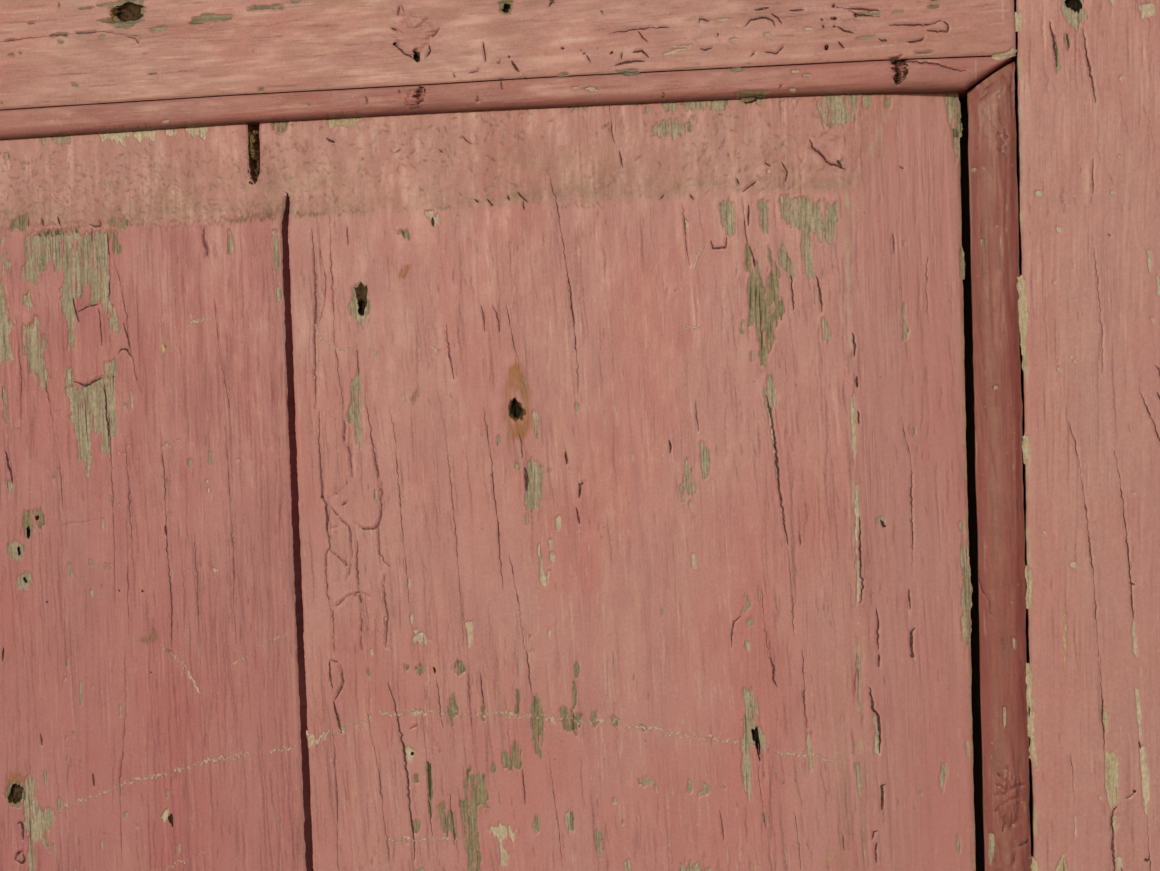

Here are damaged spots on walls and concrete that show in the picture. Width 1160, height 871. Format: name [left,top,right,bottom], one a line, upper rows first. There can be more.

spalling [7,508,45,590]
peeling [0,213,132,392]
peeling [65,359,134,480]
crack [311,223,455,871]
crack [443,419,484,724]
peeling [515,457,551,525]
peeling [719,197,735,237]
crack [731,396,807,727]
peeling [741,195,839,478]
peeling [3,771,63,871]
peeling [405,662,619,871]
spalling [741,687,767,800]